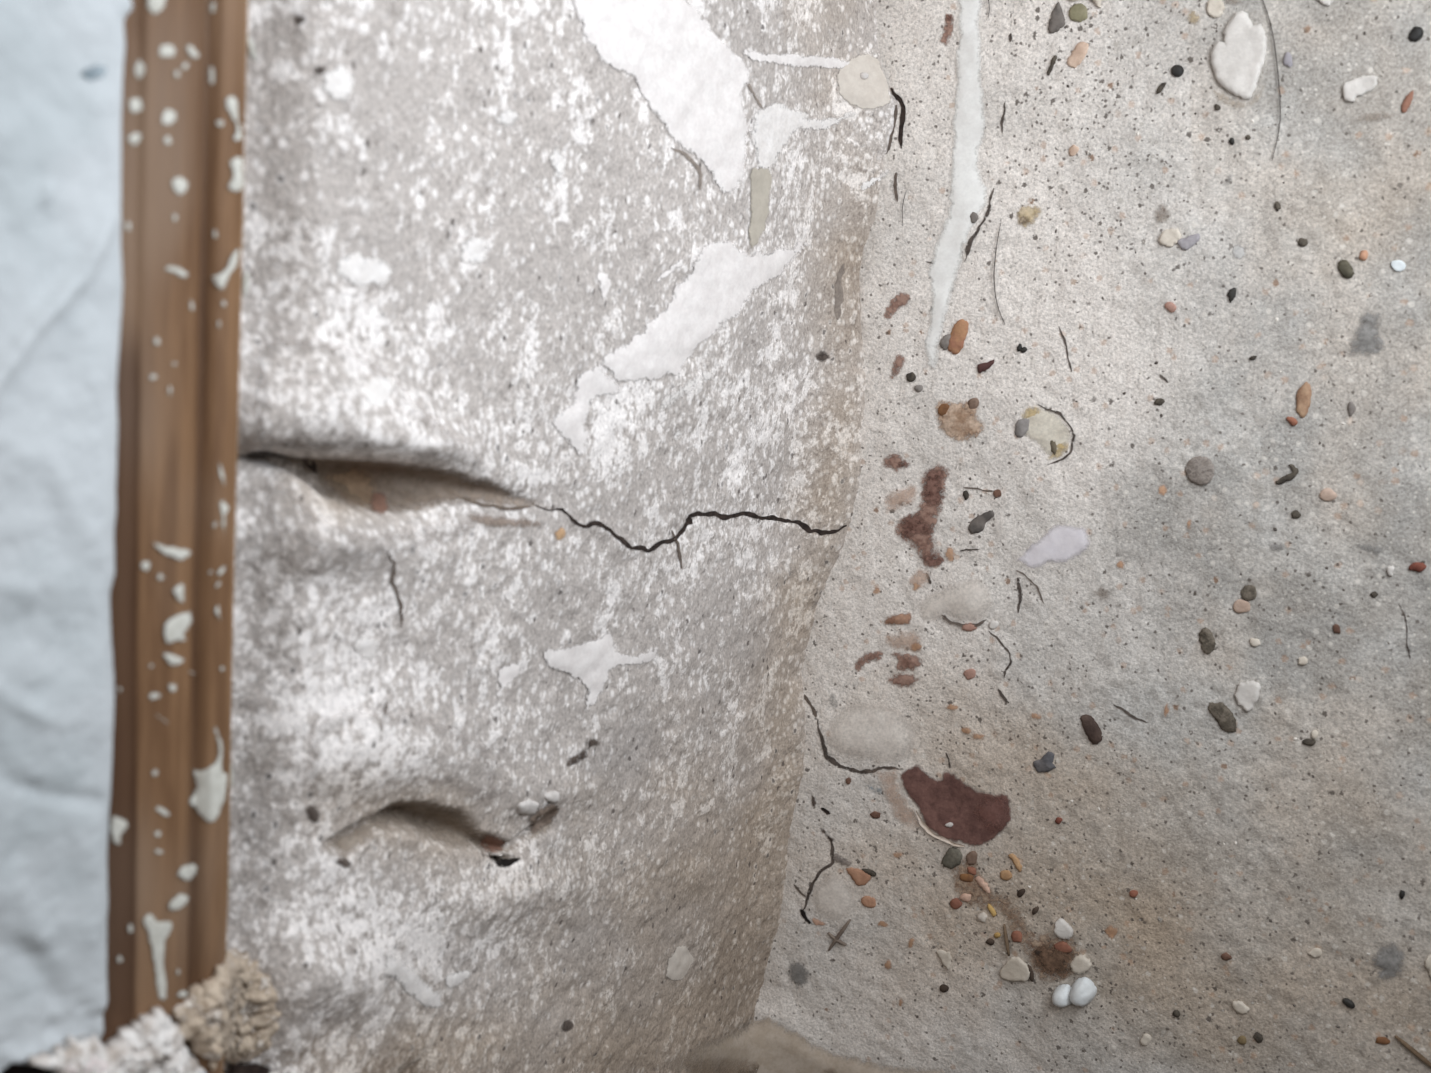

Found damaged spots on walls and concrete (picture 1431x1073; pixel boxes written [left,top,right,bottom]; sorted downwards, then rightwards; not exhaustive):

peeling [553,0,891,455]
crack [388,551,404,628]
crack [463,497,847,569]
flaking render [1,948,282,1073]